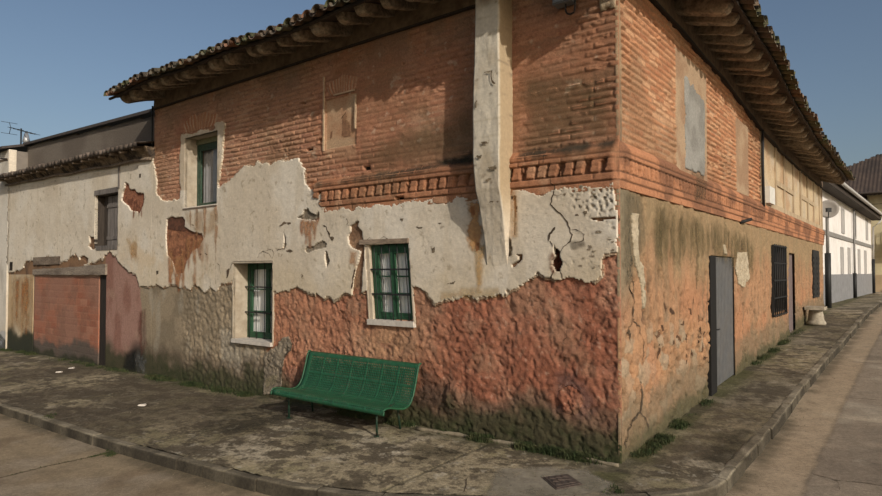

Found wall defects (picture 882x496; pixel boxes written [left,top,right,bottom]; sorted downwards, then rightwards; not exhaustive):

flaking render [123,183,144,218]
crack [543,155,584,251]
flaking render [156,217,207,291]
flaking render [347,221,365,297]